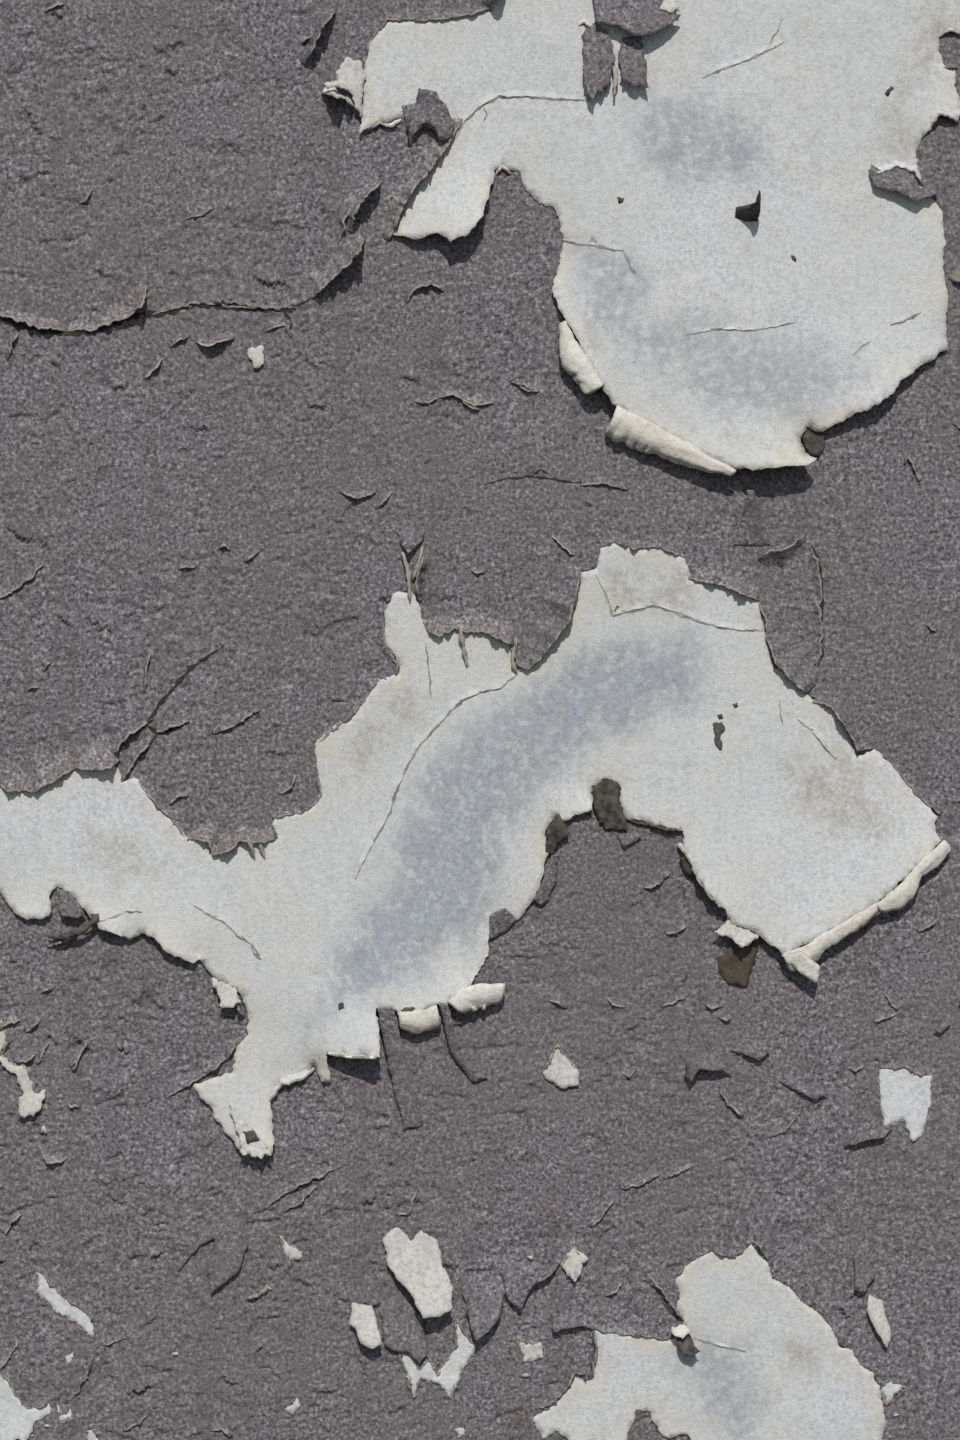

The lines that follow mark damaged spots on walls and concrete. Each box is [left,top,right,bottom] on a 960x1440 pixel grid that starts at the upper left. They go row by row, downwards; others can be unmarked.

peeling [298,9,336,65]
peeling [321,0,960,476]
peeling [144,321,294,379]
peeling [339,487,393,509]
peeling [580,476,629,490]
peeling [733,490,807,568]
crack [355,648,518,880]
peeling [0,527,951,1165]
peeling [0,1340,98,1440]
peeling [34,1265,127,1346]
peeling [349,1189,588,1400]
peeling [516,1240,903,1440]